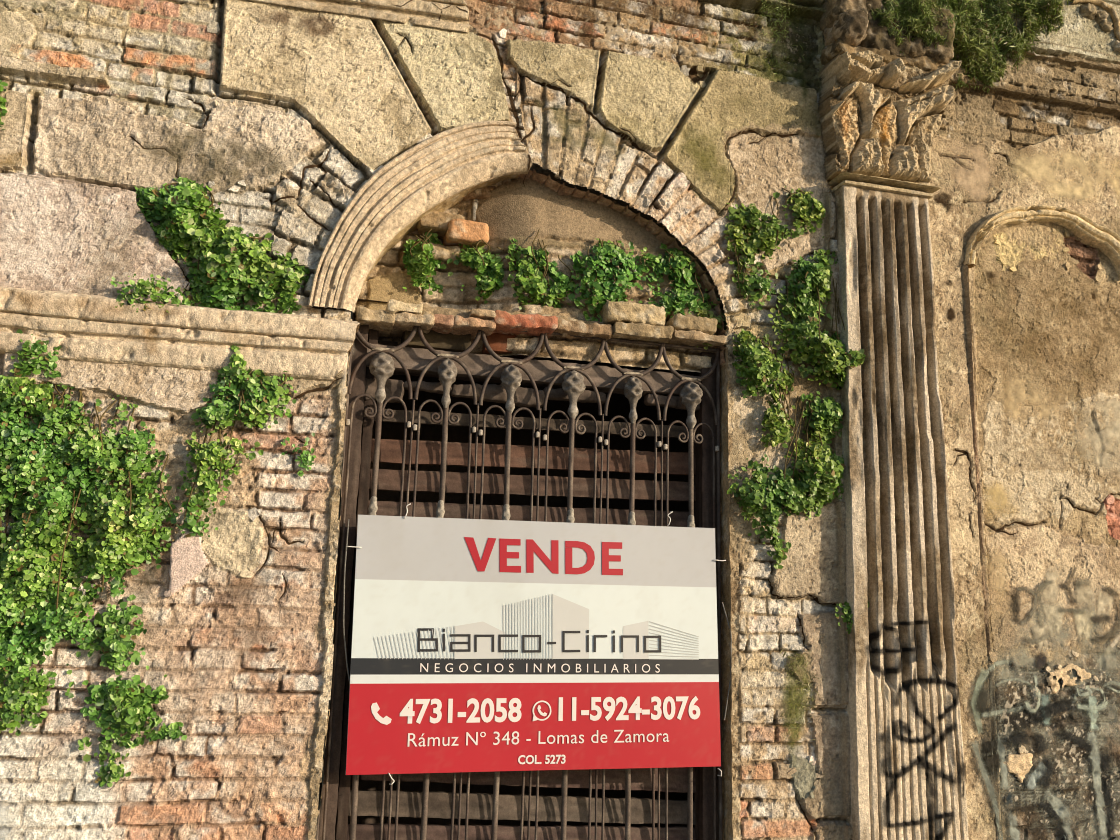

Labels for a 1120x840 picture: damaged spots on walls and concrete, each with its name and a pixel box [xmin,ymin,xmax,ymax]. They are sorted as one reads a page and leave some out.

spalling [472,0,826,91]
crack [396,0,654,186]
peeling [994,228,1102,282]
crack [953,448,1120,535]
spalling [1103,495,1120,540]
spalling [987,623,1120,840]